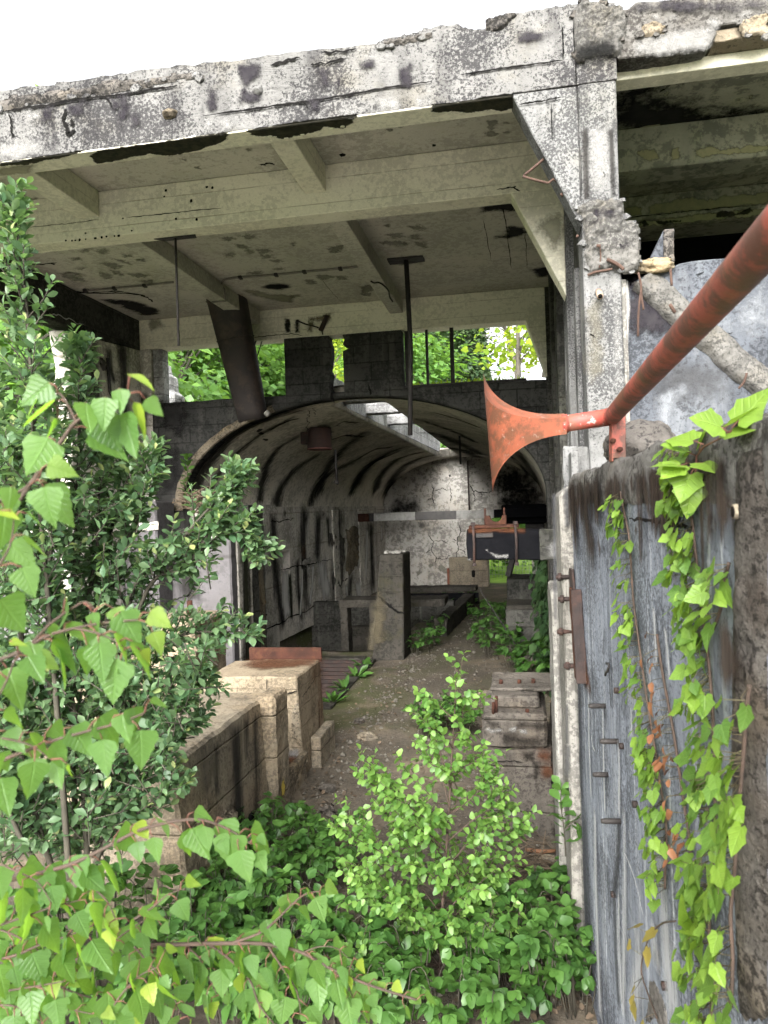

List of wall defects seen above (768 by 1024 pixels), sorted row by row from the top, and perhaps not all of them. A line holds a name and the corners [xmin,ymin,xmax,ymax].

spalling [736,10,768,41]
peeling [246,112,358,140]
peeling [0,132,228,169]
spalling [522,158,563,197]
peeling [716,208,753,217]
spalling [572,196,681,336]
leakage [698,458,736,571]
leakage [553,470,674,620]